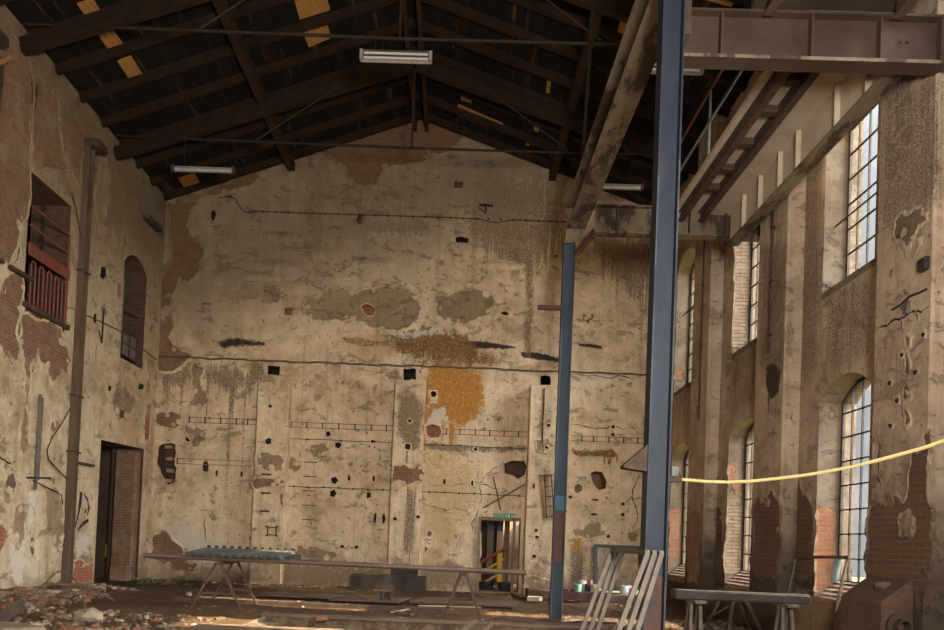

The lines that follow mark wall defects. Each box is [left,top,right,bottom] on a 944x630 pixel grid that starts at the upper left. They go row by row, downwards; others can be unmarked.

spalling [314,119,467,192]
spalling [0,25,111,460]
damp [459,163,567,283]
spalling [83,171,262,490]
crack [875,305,929,332]
peeling [0,470,35,566]
peeling [44,476,65,558]
corrosion [339,320,497,573]
spalling [668,505,702,589]
spalling [714,461,783,588]
spalling [795,480,838,592]
spalling [863,329,937,598]